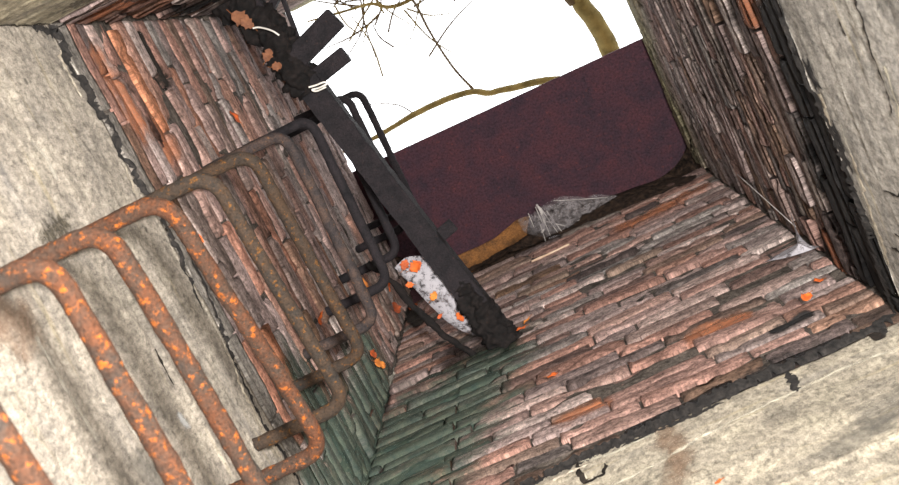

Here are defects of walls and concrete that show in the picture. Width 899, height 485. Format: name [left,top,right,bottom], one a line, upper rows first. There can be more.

crack [0,0,150,197]
crack [161,218,301,485]
crack [517,0,899,485]